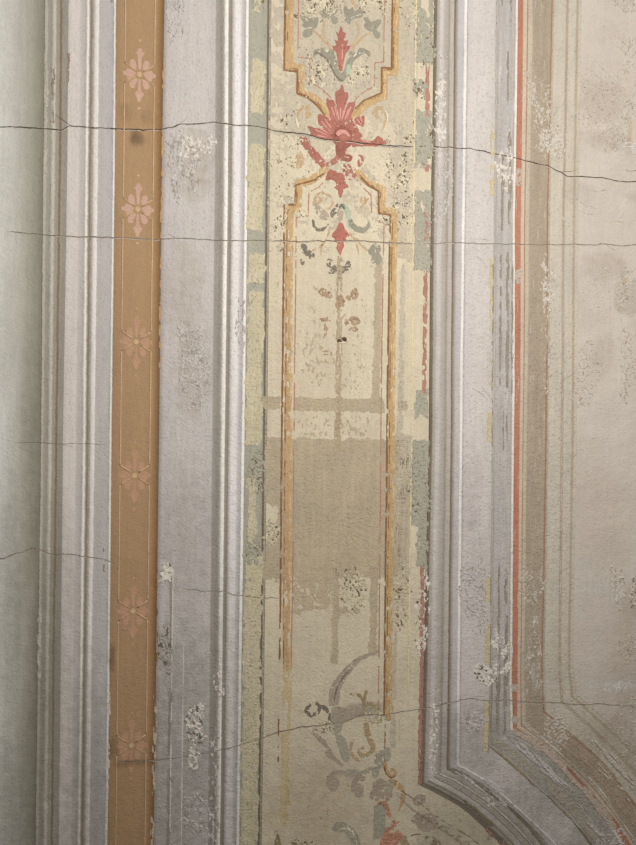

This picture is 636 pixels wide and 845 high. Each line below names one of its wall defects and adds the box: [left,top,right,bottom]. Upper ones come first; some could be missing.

crack [3,115,636,183]
crack [10,231,636,249]
crack [0,546,118,568]
crack [114,696,636,762]